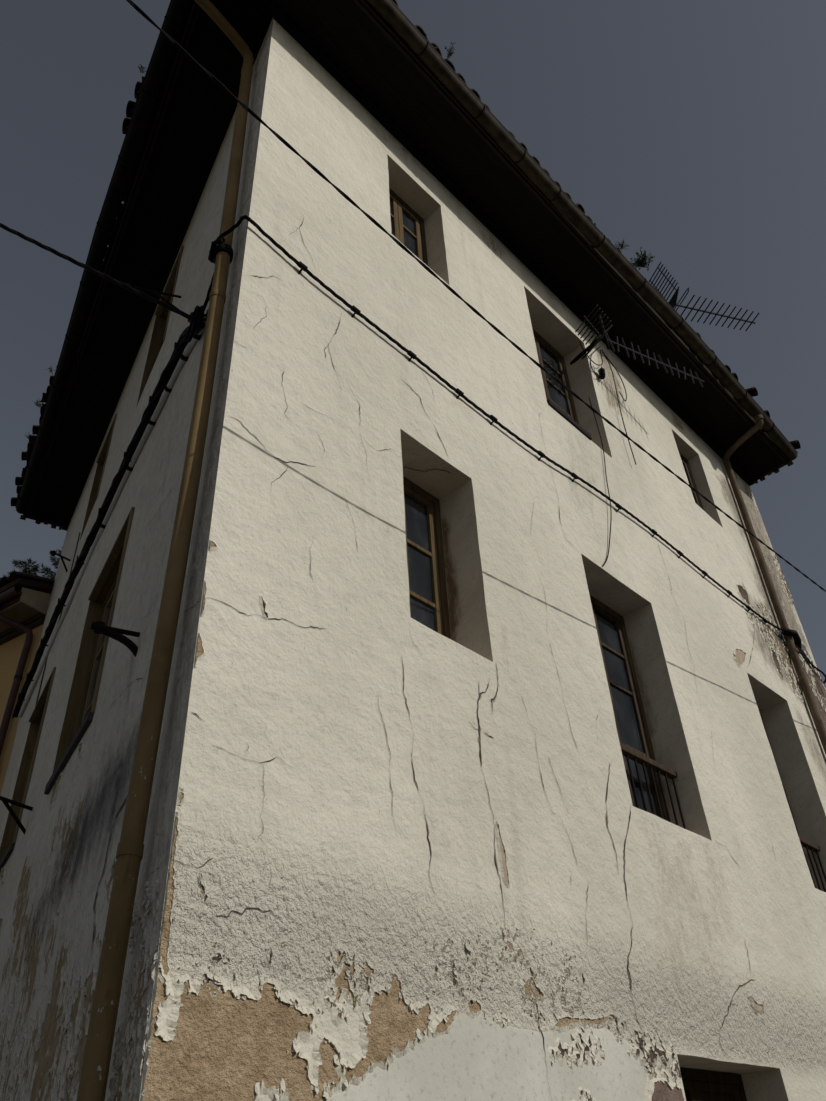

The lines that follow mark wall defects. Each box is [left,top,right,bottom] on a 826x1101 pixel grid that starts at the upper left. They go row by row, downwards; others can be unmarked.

crack [233,298,450,479]
crack [184,598,323,629]
water stain [723,481,819,708]
peeling [0,771,104,1101]
crack [67,794,128,1101]
crack [213,907,277,917]
peeling [108,786,684,1101]
crack [378,623,435,895]
crack [471,665,588,939]
crack [606,766,642,1029]
crack [719,943,775,1056]